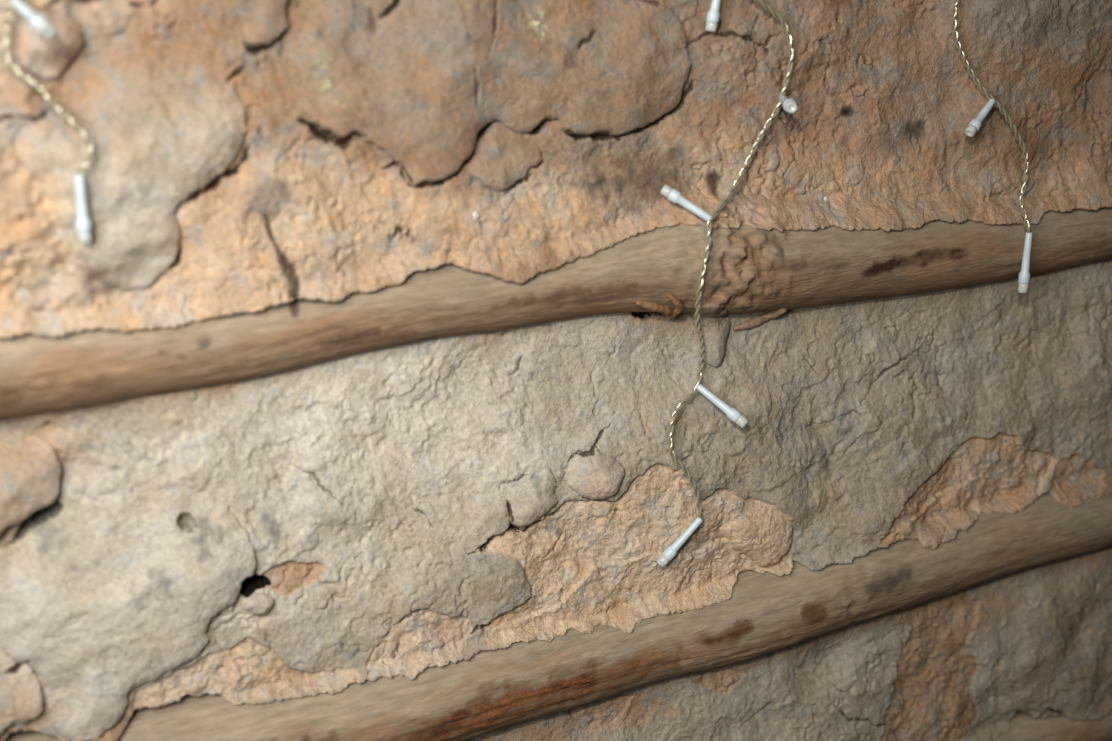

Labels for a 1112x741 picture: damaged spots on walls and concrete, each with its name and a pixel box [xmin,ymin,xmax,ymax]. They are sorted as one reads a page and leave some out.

crack [641,0,663,8]
crack [226,29,289,84]
crack [578,30,596,49]
crack [685,29,782,53]
crack [297,118,368,150]
crack [379,0,521,189]
crack [528,80,693,142]
crack [176,145,250,210]
crack [503,162,542,195]
spalling [881,434,1101,548]
spalling [133,464,792,708]
spalling [569,696,630,730]